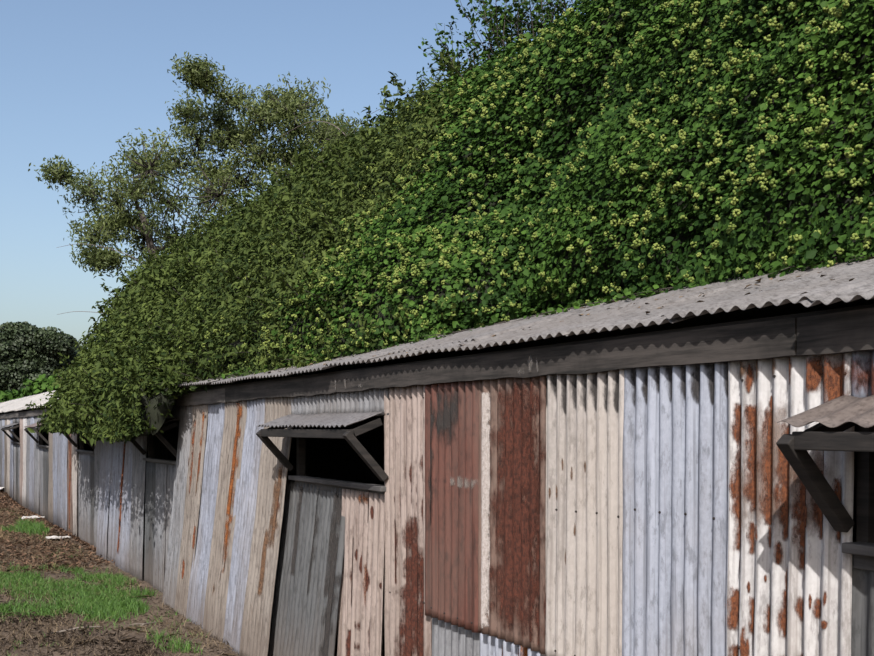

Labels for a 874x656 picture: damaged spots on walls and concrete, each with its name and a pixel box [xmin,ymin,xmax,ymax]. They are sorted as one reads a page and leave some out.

corrosion [740,361,757,392]
corrosion [806,354,874,403]
corrosion [220,403,242,577]
corrosion [346,622,370,656]
corrosion [350,538,382,607]
corrosion [394,455,424,656]
corrosion [489,380,557,656]
corrosion [727,395,827,656]